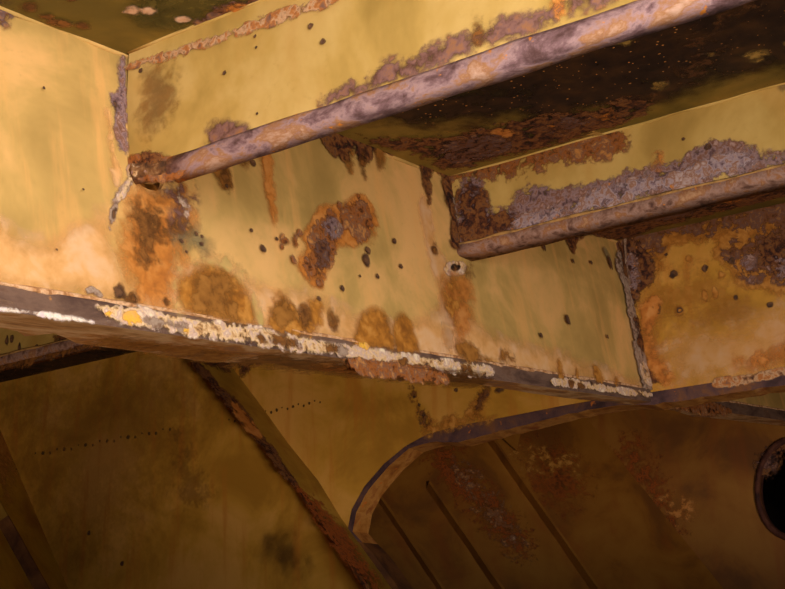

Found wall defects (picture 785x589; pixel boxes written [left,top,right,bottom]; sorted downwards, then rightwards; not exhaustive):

rust [0,2,14,28]
water stain [131,0,234,30]
rust [317,0,616,108]
rust [108,0,339,339]
rust [321,93,785,249]
rust [280,194,379,288]
rust [0,267,504,546]
peeling [86,286,495,378]
peeling [550,377,653,397]
rust [566,189,785,390]
peeling [712,367,785,388]
rust [0,516,50,589]